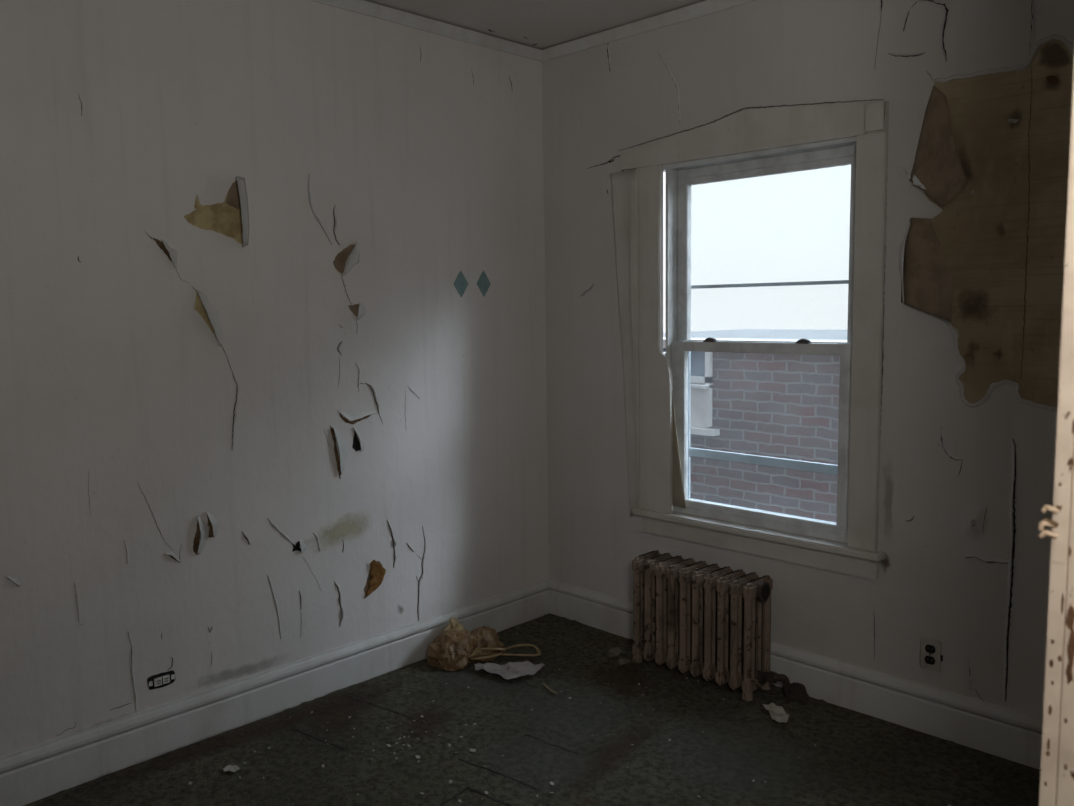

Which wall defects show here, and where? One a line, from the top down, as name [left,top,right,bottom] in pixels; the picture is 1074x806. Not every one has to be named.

crack [874,0,949,82]
crack [588,99,881,193]
crack [387,520,426,621]
crack [1003,439,1017,702]